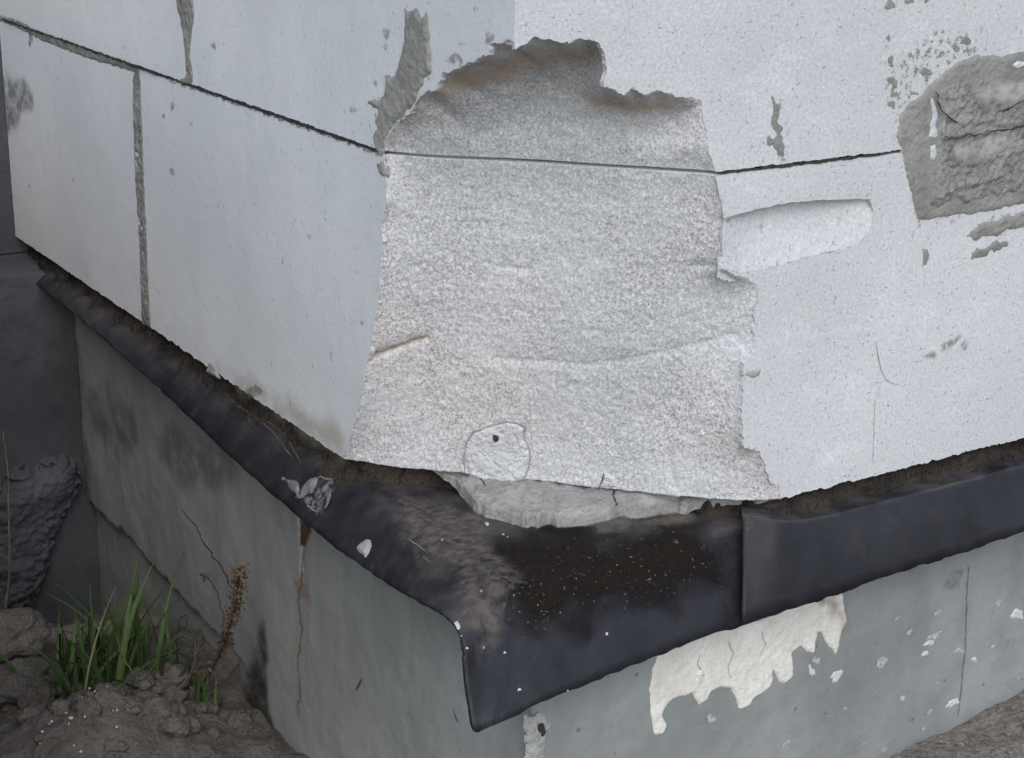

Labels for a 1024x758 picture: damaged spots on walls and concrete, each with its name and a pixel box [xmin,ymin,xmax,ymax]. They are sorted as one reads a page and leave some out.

crack [2,18,381,155]
crack [718,153,881,174]
spalling [343,37,784,501]
corrosion [300,520,309,545]
crack [296,550,304,715]
peeling [649,593,847,735]
crack [958,565,969,717]